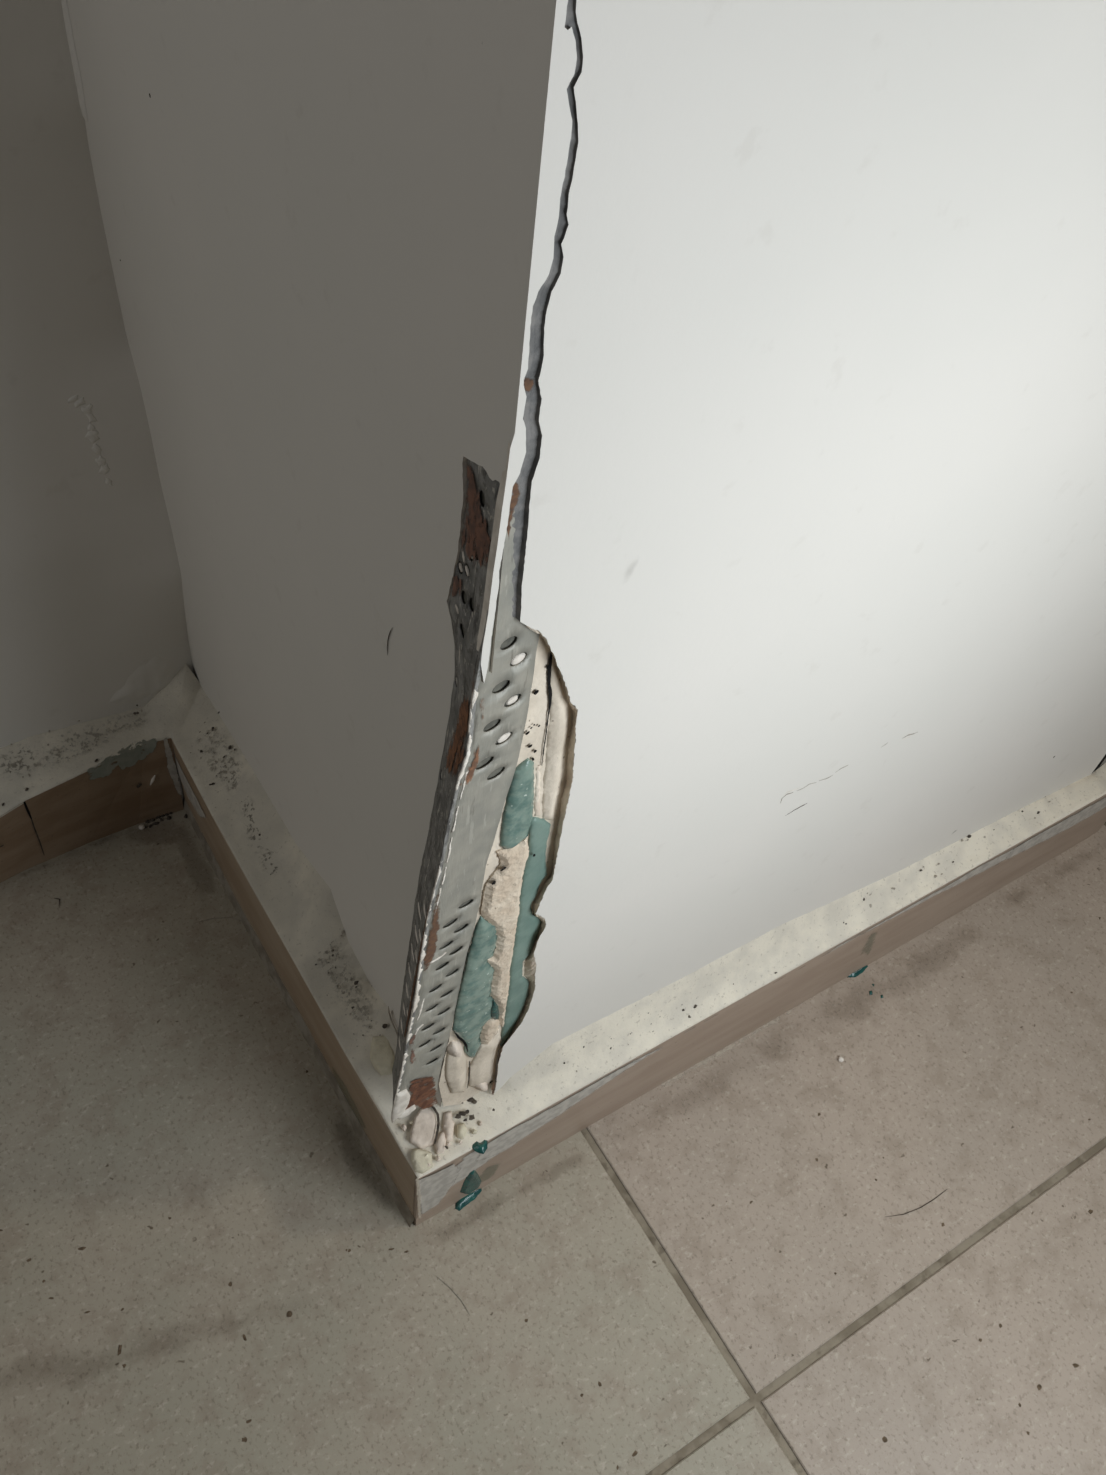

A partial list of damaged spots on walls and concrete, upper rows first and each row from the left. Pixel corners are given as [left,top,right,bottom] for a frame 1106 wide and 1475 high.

corrosion [461,465,490,566]
crack [507,0,583,621]
corrosion [404,895,440,1110]
peeling [391,690,478,1123]
corrosion [446,684,483,785]
flaking render [439,626,578,1107]